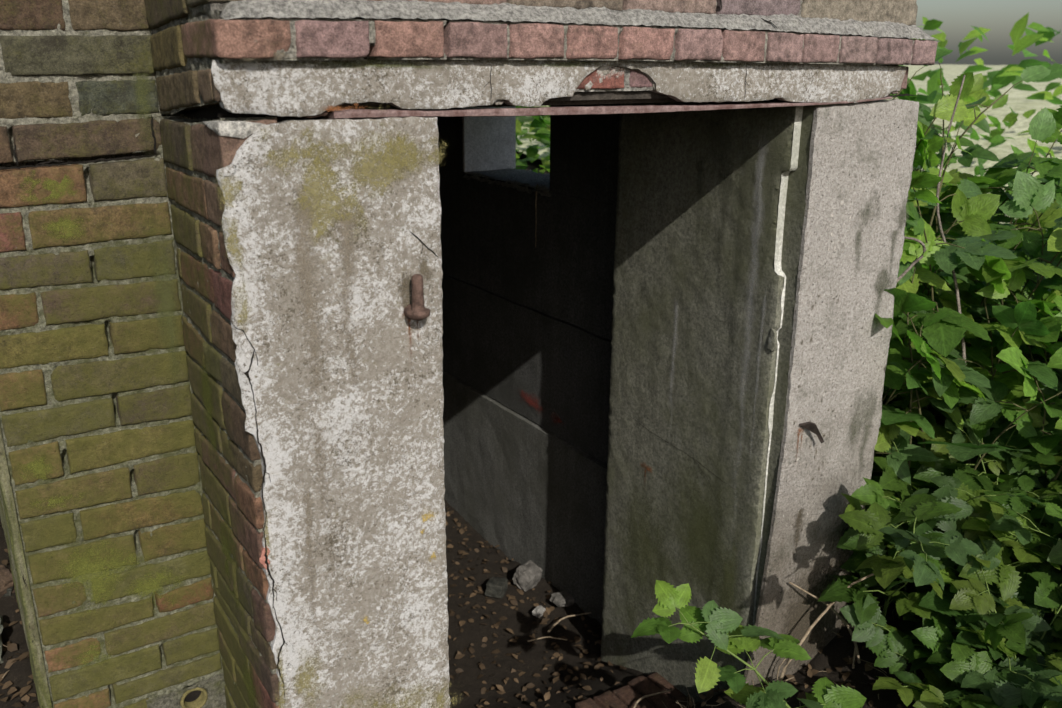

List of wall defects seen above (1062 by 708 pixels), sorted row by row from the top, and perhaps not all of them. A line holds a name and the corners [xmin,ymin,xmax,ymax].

spalling [584,64,655,90]
spalling [223,125,268,177]
peeling [267,111,367,243]
crack [231,320,287,703]